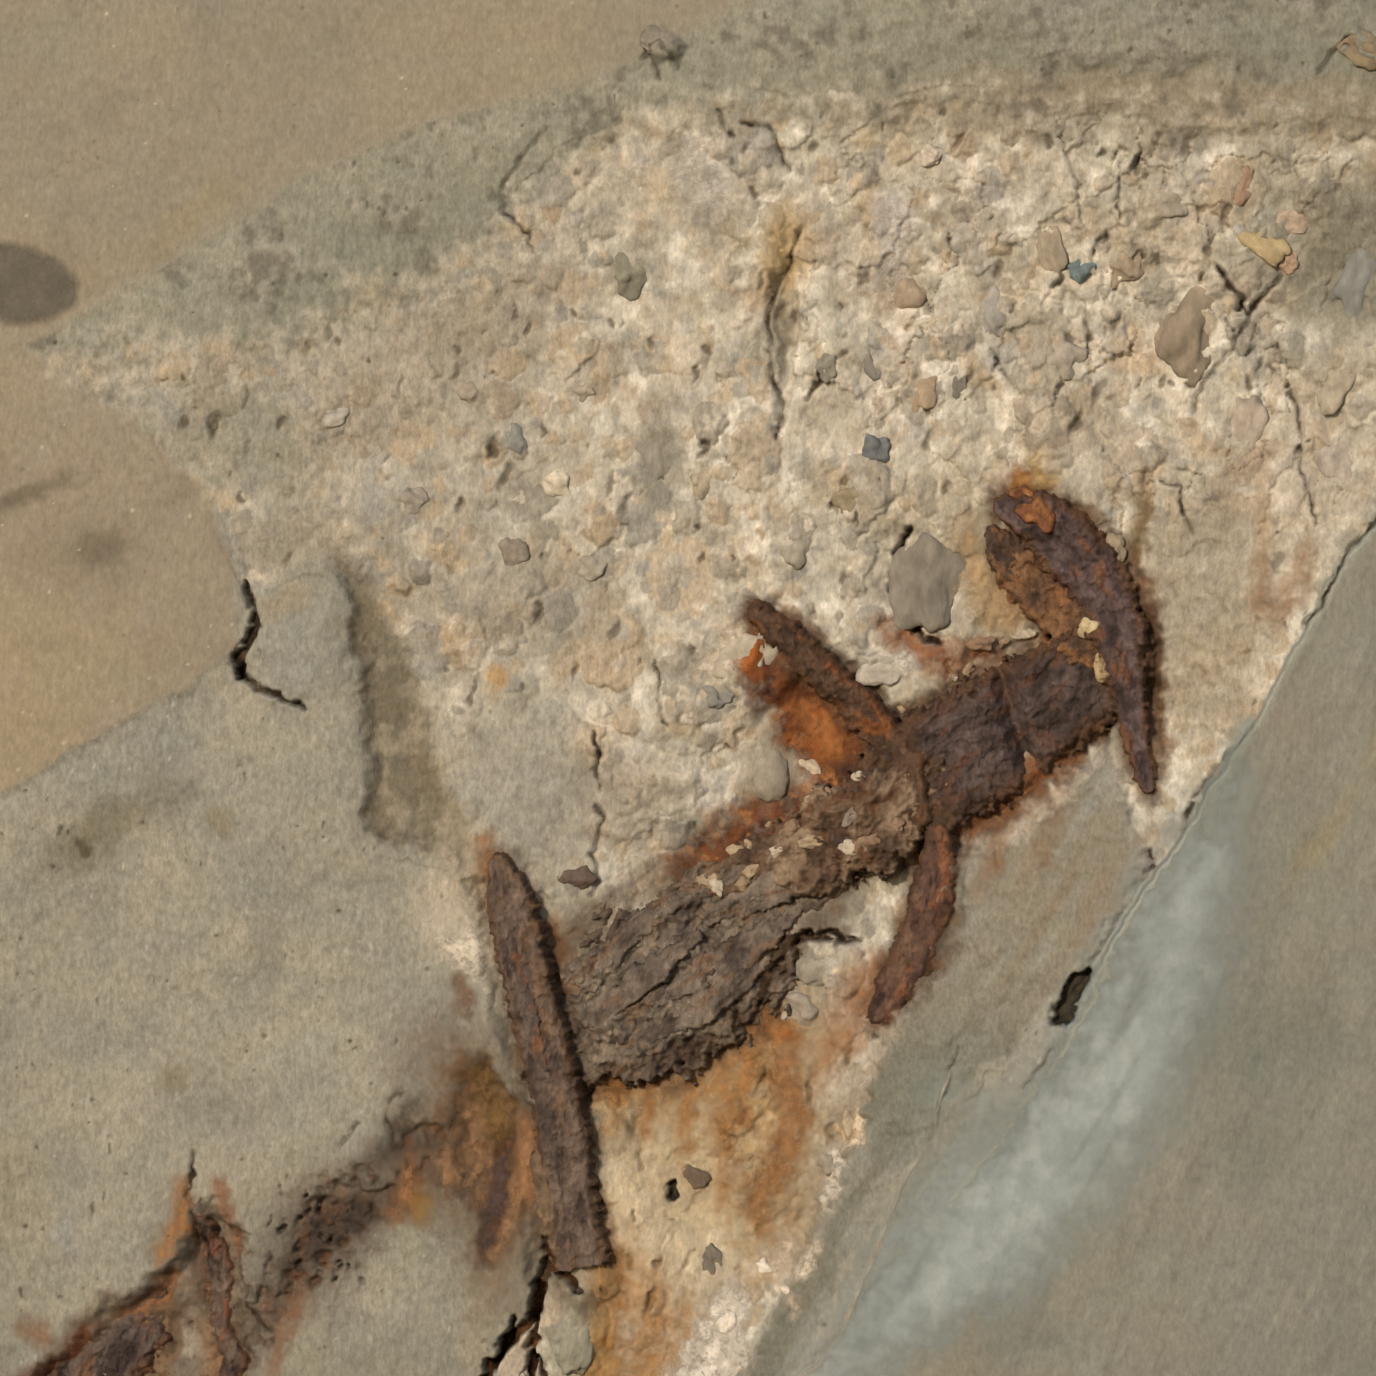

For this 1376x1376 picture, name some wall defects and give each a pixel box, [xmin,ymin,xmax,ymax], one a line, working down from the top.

water stain [0,245,76,322]
crack [234,583,306,708]
rust [665,628,868,877]
spalling [742,596,932,833]
rust [879,621,992,674]
spalling [899,630,1118,832]
spalling [983,485,1163,800]
spalling [555,859,848,1091]
rust [286,1049,539,1274]
spalling [481,852,613,1376]
rust [593,960,879,1253]
crack [483,1235,578,1376]